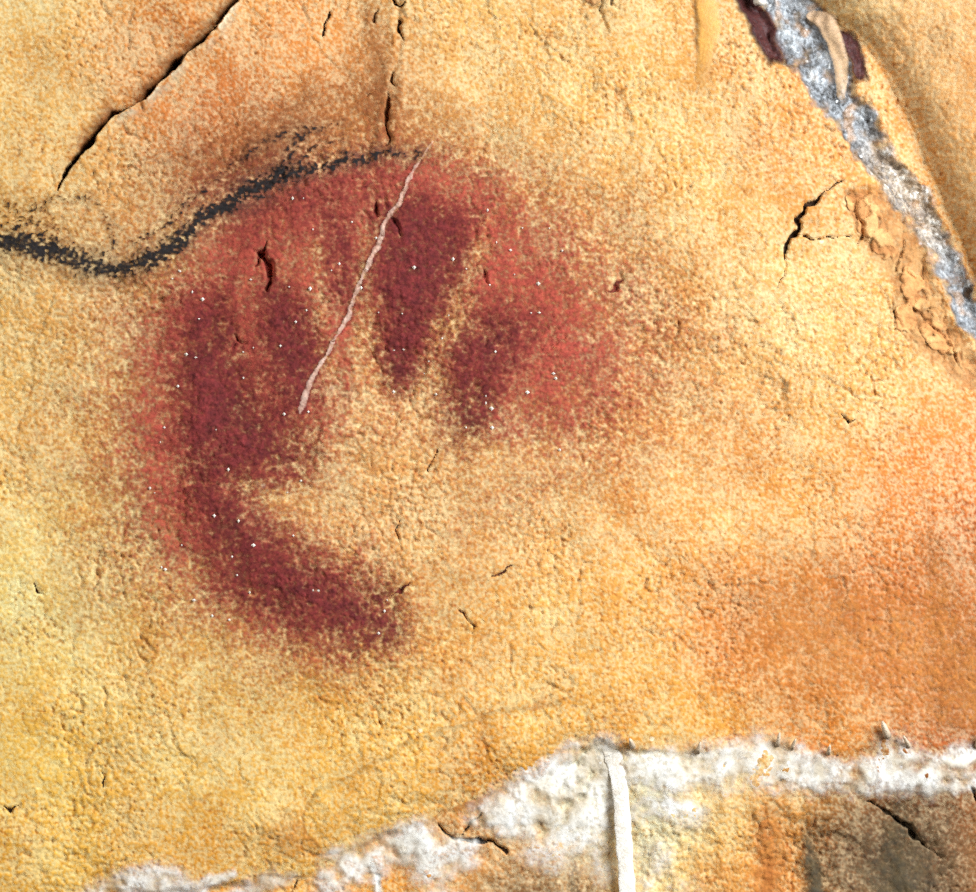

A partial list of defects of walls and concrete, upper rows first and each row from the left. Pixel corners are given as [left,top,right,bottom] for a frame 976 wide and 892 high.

crack [372,0,406,40]
crack [58,0,239,189]
crack [367,74,395,146]
crack [779,181,864,283]
leakage [470,737,616,864]
leakage [624,736,976,820]
leakage [94,866,296,892]
leakage [316,823,476,892]
leakage [805,840,823,892]
leakage [836,811,963,892]